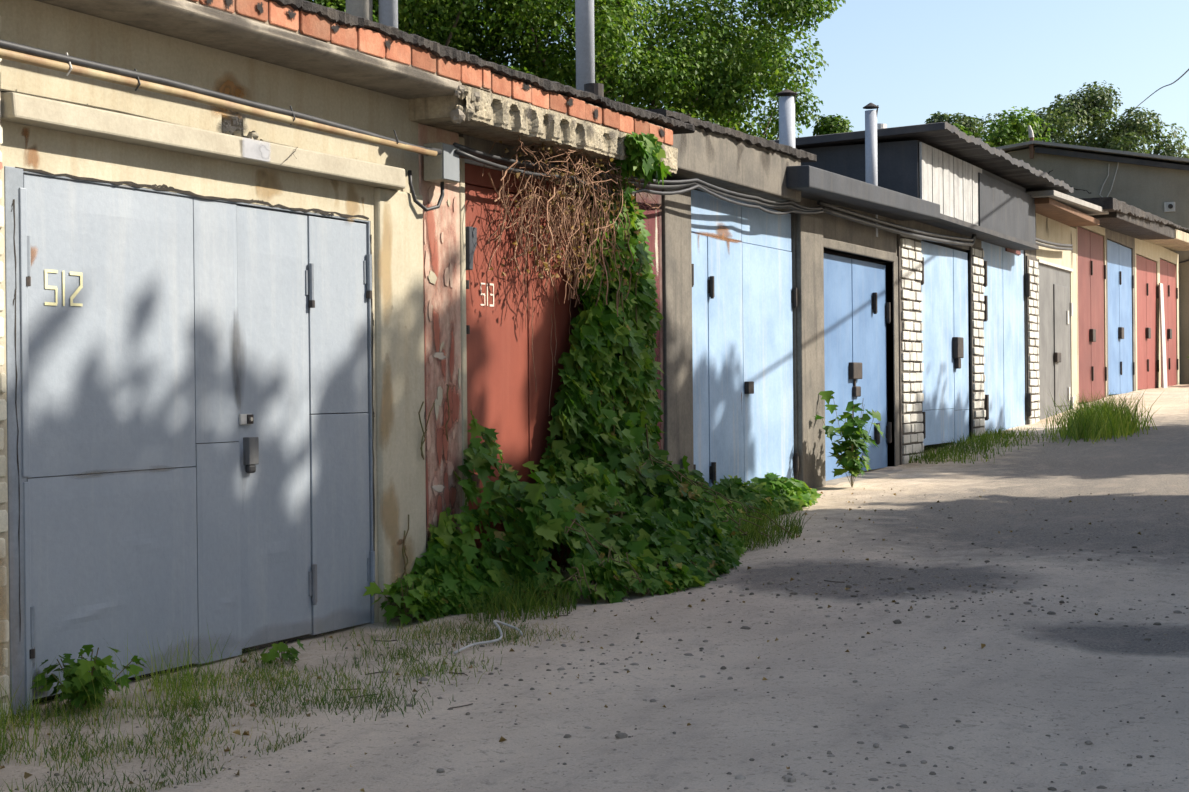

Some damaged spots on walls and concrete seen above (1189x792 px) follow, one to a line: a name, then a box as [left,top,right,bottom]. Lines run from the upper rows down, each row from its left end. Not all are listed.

corrosion [218,79,245,99]
spalling [450,85,481,124]
peeling [423,186,461,541]